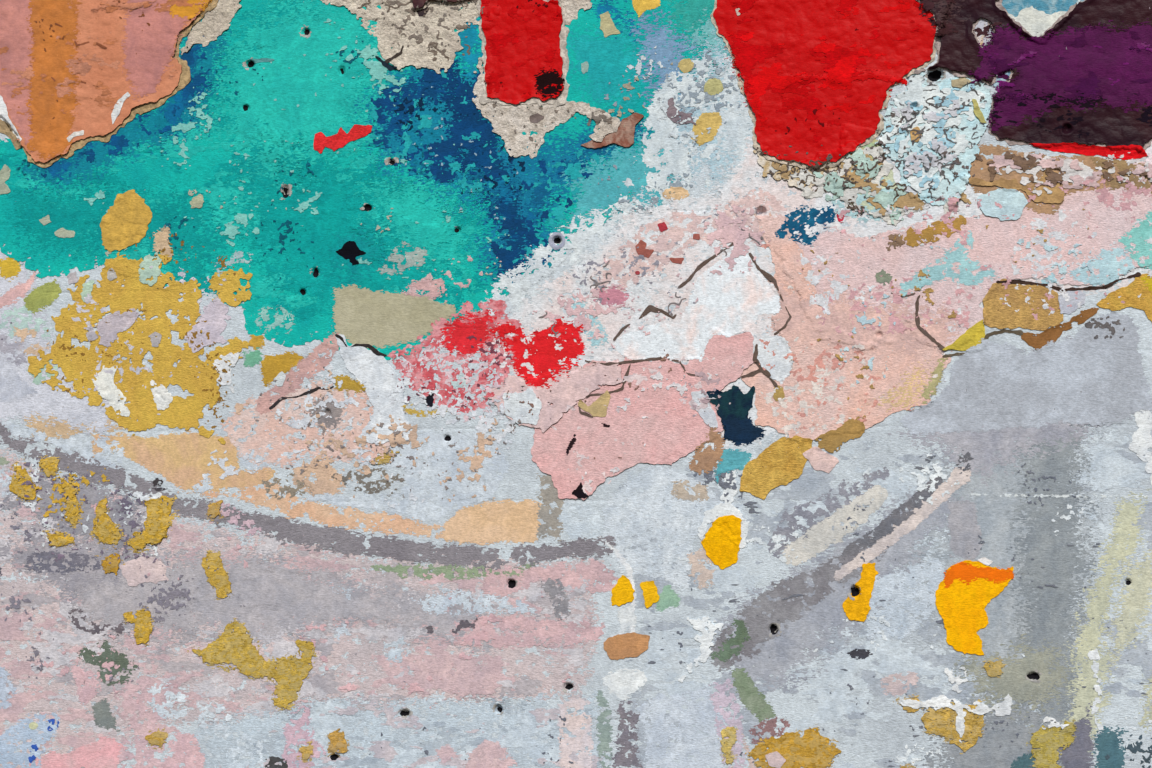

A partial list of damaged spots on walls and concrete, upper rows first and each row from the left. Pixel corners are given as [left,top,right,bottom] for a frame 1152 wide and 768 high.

peeling [0,0,242,168]
peeling [313,0,644,159]
peeling [138,252,162,286]
peeling [447,0,1152,500]
crack [996,272,1141,292]
peeling [84,308,140,347]
peeling [184,268,253,393]
peeling [255,306,273,330]
crack [579,228,792,418]
crack [891,287,1023,358]
peeling [92,365,130,417]
peeling [150,380,173,410]